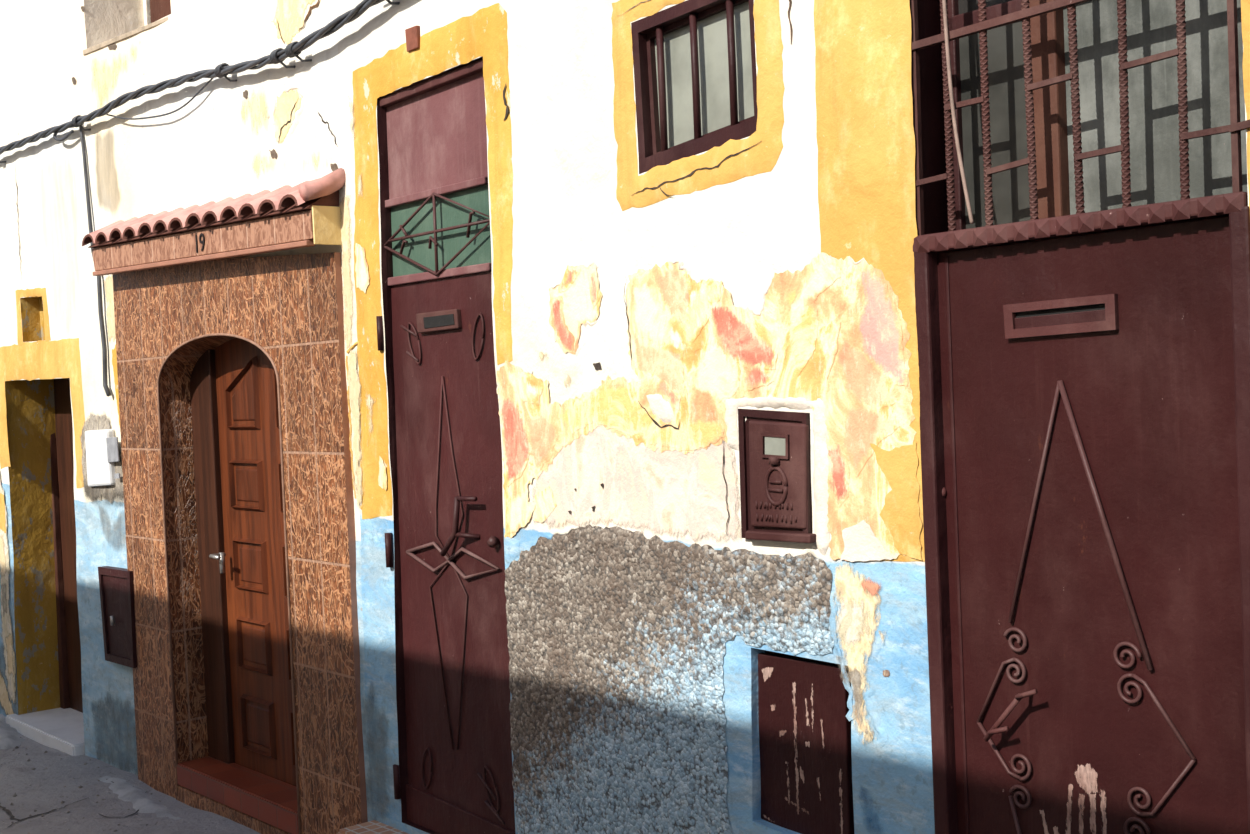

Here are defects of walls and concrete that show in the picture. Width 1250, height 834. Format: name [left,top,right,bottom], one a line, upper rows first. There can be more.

peeling [270,0,319,44]
crack [786,0,794,42]
peeling [269,83,308,159]
flaking render [496,252,922,834]